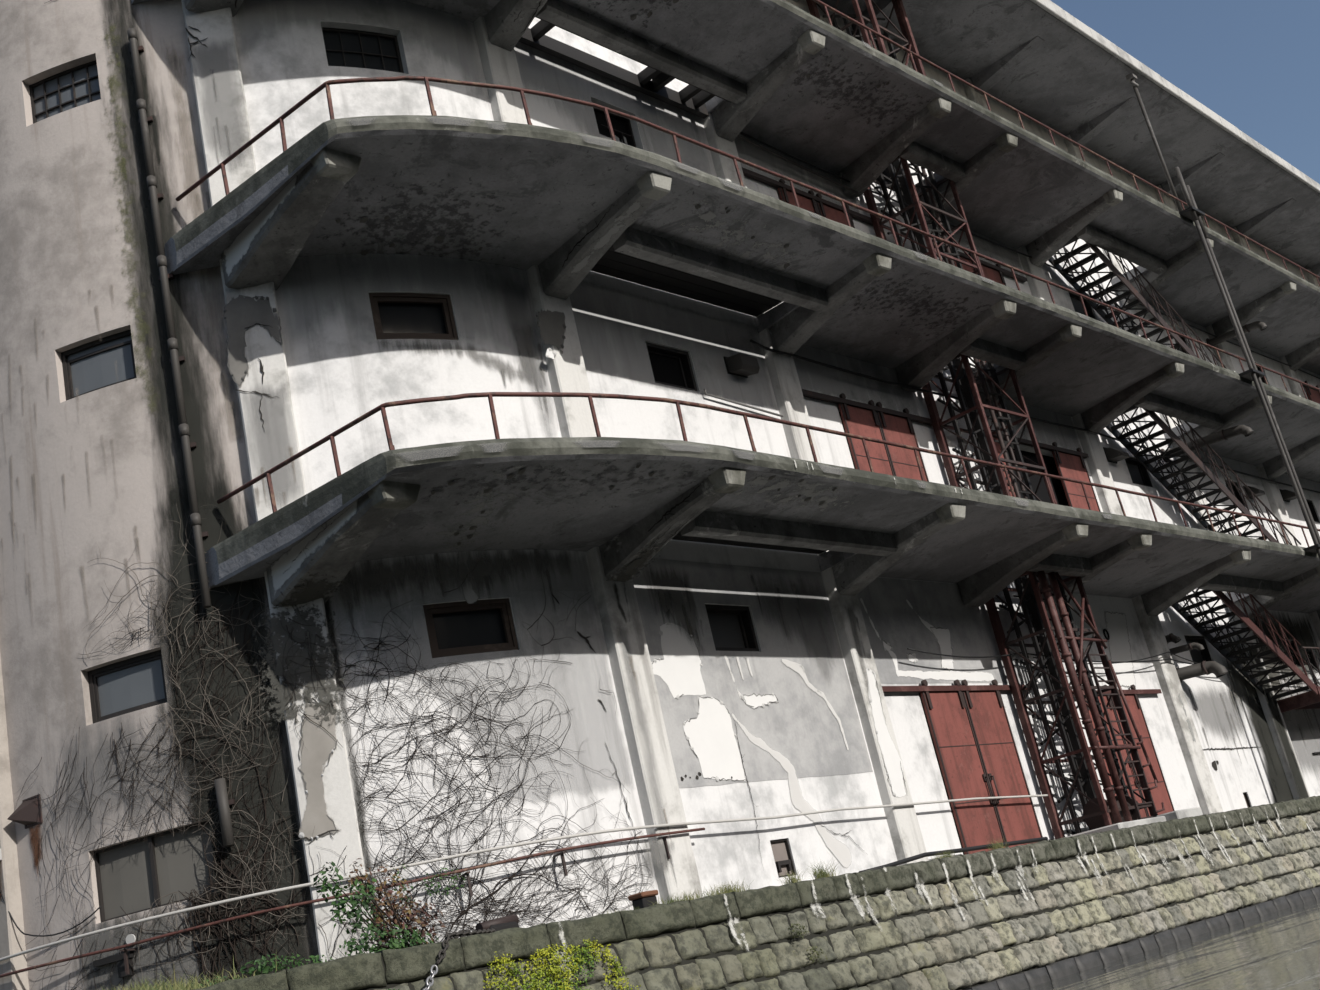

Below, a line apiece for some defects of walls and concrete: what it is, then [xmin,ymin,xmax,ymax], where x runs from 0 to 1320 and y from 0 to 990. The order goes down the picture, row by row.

peeling [224,295,282,388]
crack [237,358,279,432]
leakage [67,0,569,979]
crack [577,631,595,652]
peeling [860,598,994,681]
peeling [651,622,747,781]
peeling [298,699,339,841]
crack [605,743,650,871]
leakage [724,894,748,949]
leakage [845,874,880,927]
leakage [915,873,932,905]
leakage [1077,836,1107,883]